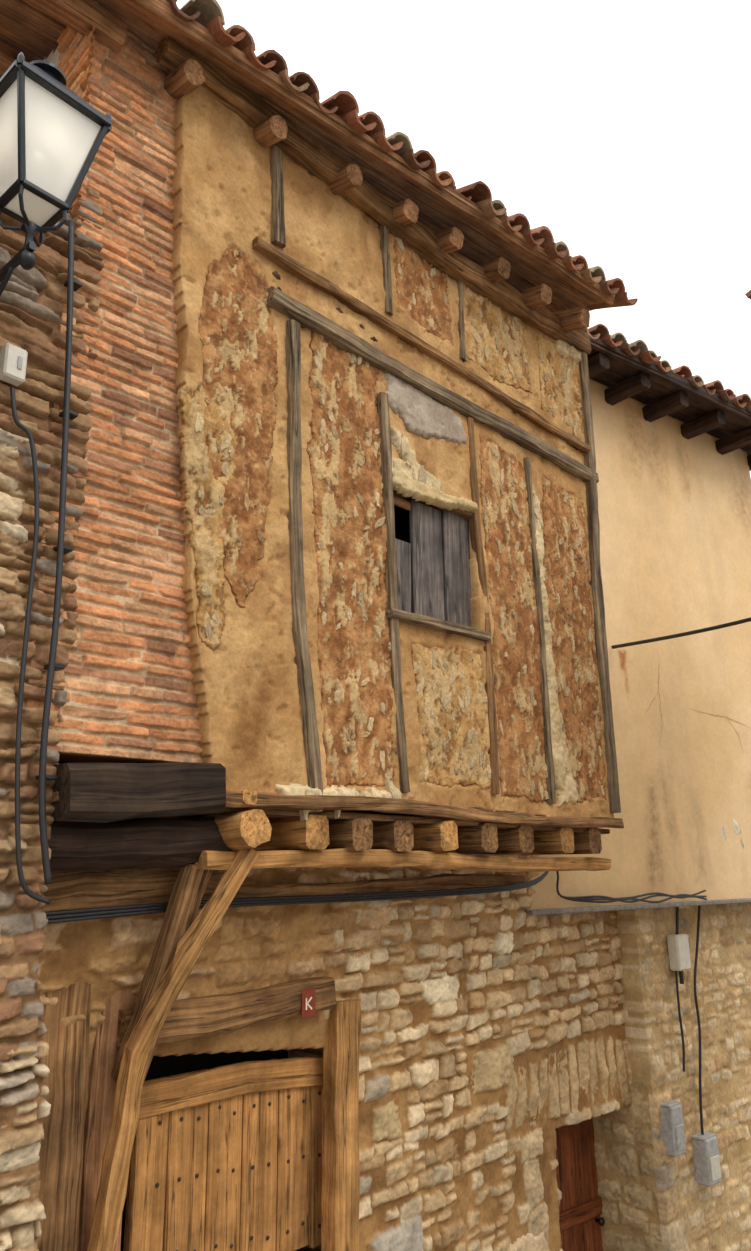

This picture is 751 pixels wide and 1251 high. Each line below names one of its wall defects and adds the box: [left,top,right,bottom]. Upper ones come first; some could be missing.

flaking render [177,247,282,650]
flaking render [299,332,427,821]
flaking render [393,237,583,437]
flaking render [411,435,607,803]